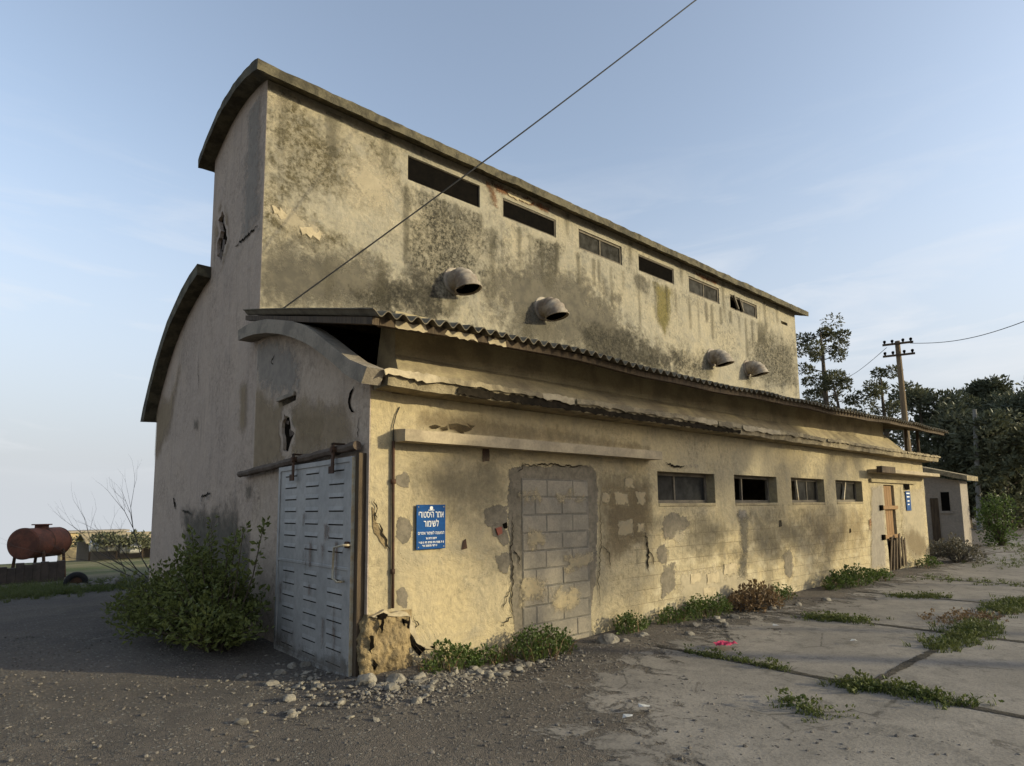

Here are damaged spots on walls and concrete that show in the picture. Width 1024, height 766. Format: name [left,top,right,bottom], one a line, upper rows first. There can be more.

peeling [215,102,323,259]
damp [261,102,705,378]
peeling [253,341,350,468]
peeling [384,368,941,458]
spalling [372,500,390,550]
spalling [492,522,507,537]
crack [645,533,655,571]
flaking render [356,609,425,675]